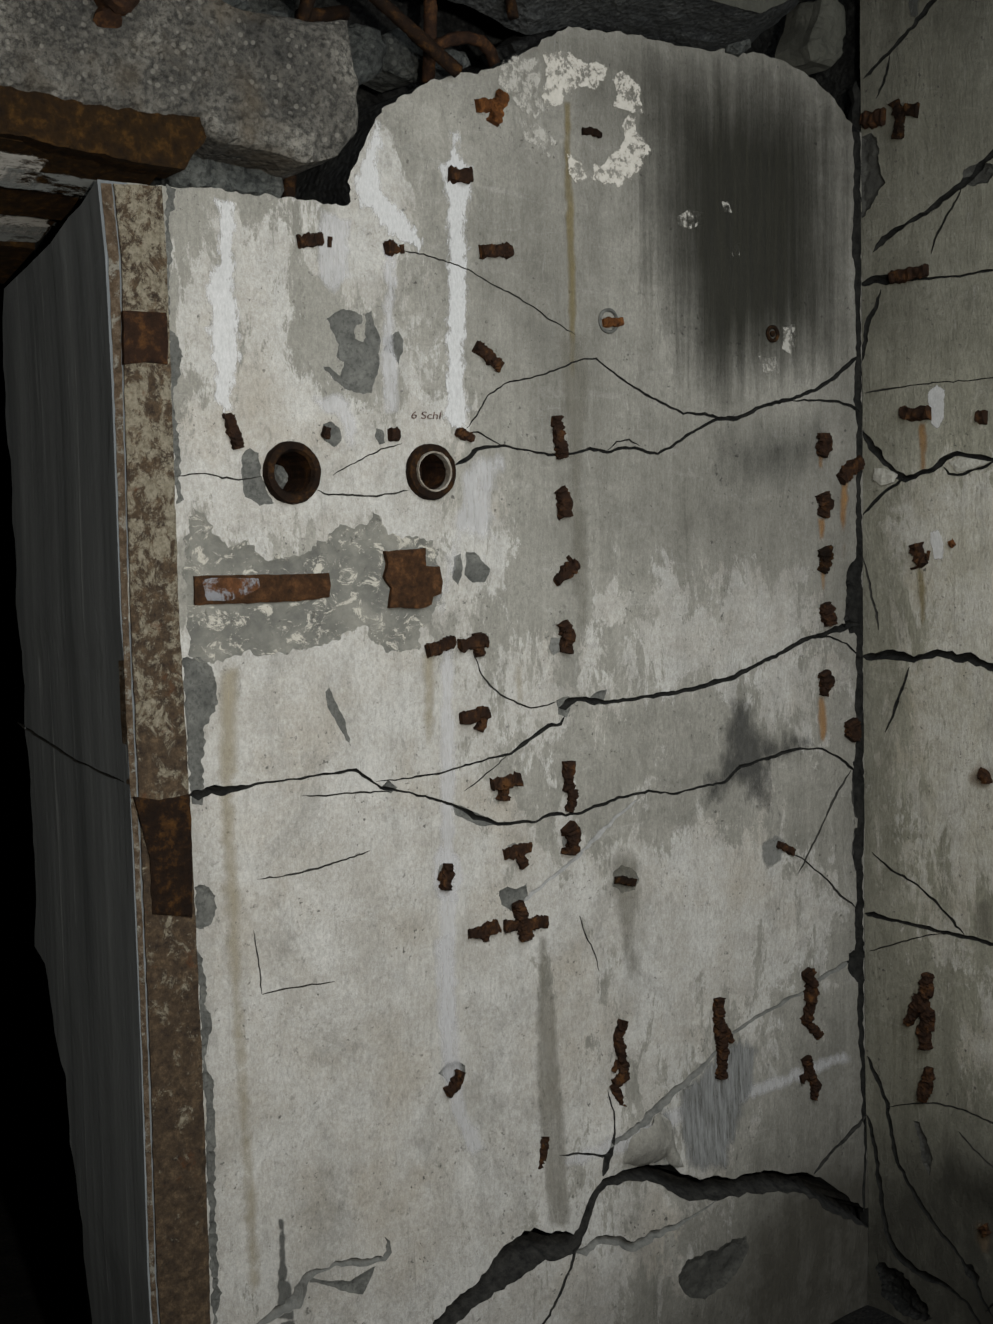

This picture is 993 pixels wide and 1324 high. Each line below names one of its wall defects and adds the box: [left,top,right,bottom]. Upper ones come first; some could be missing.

crack [863,0,937,98]
peeling [498,51,651,187]
peeling [759,325,795,373]
spalling [164,184,490,805]
crack [181,81,993,1324]
spalling [452,805,494,826]
spalling [195,884,217,929]
spalling [197,949,222,1324]
spalling [678,1236,749,1300]